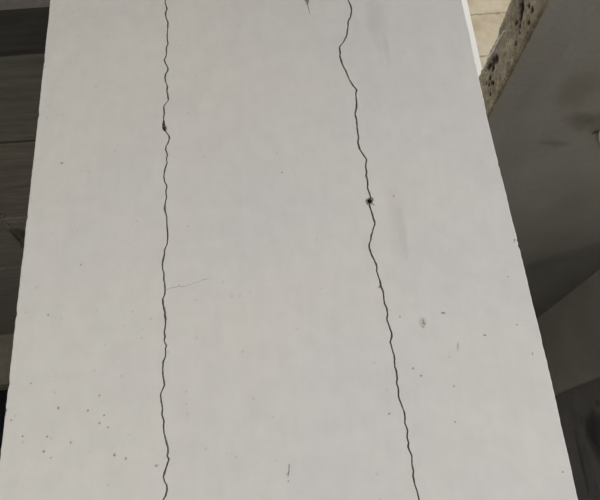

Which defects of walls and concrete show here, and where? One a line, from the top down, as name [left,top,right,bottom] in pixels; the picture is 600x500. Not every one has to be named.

crack [160,0,170,500]
crack [339,0,420,500]